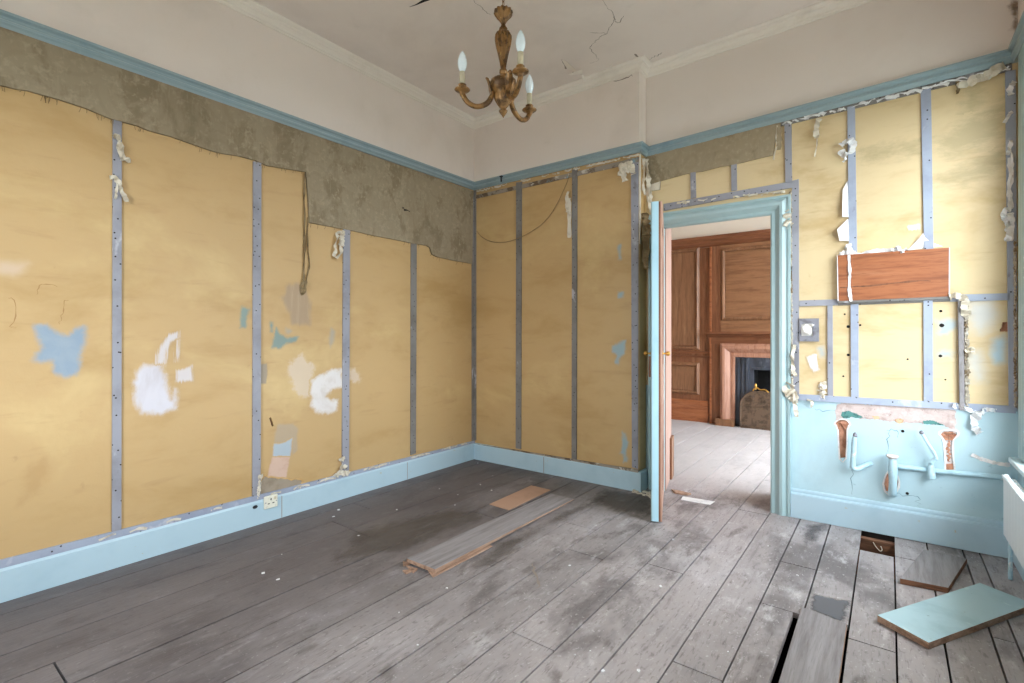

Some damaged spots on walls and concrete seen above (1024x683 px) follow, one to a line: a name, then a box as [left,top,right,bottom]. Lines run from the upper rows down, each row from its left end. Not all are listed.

flaking render [835,403,957,467]